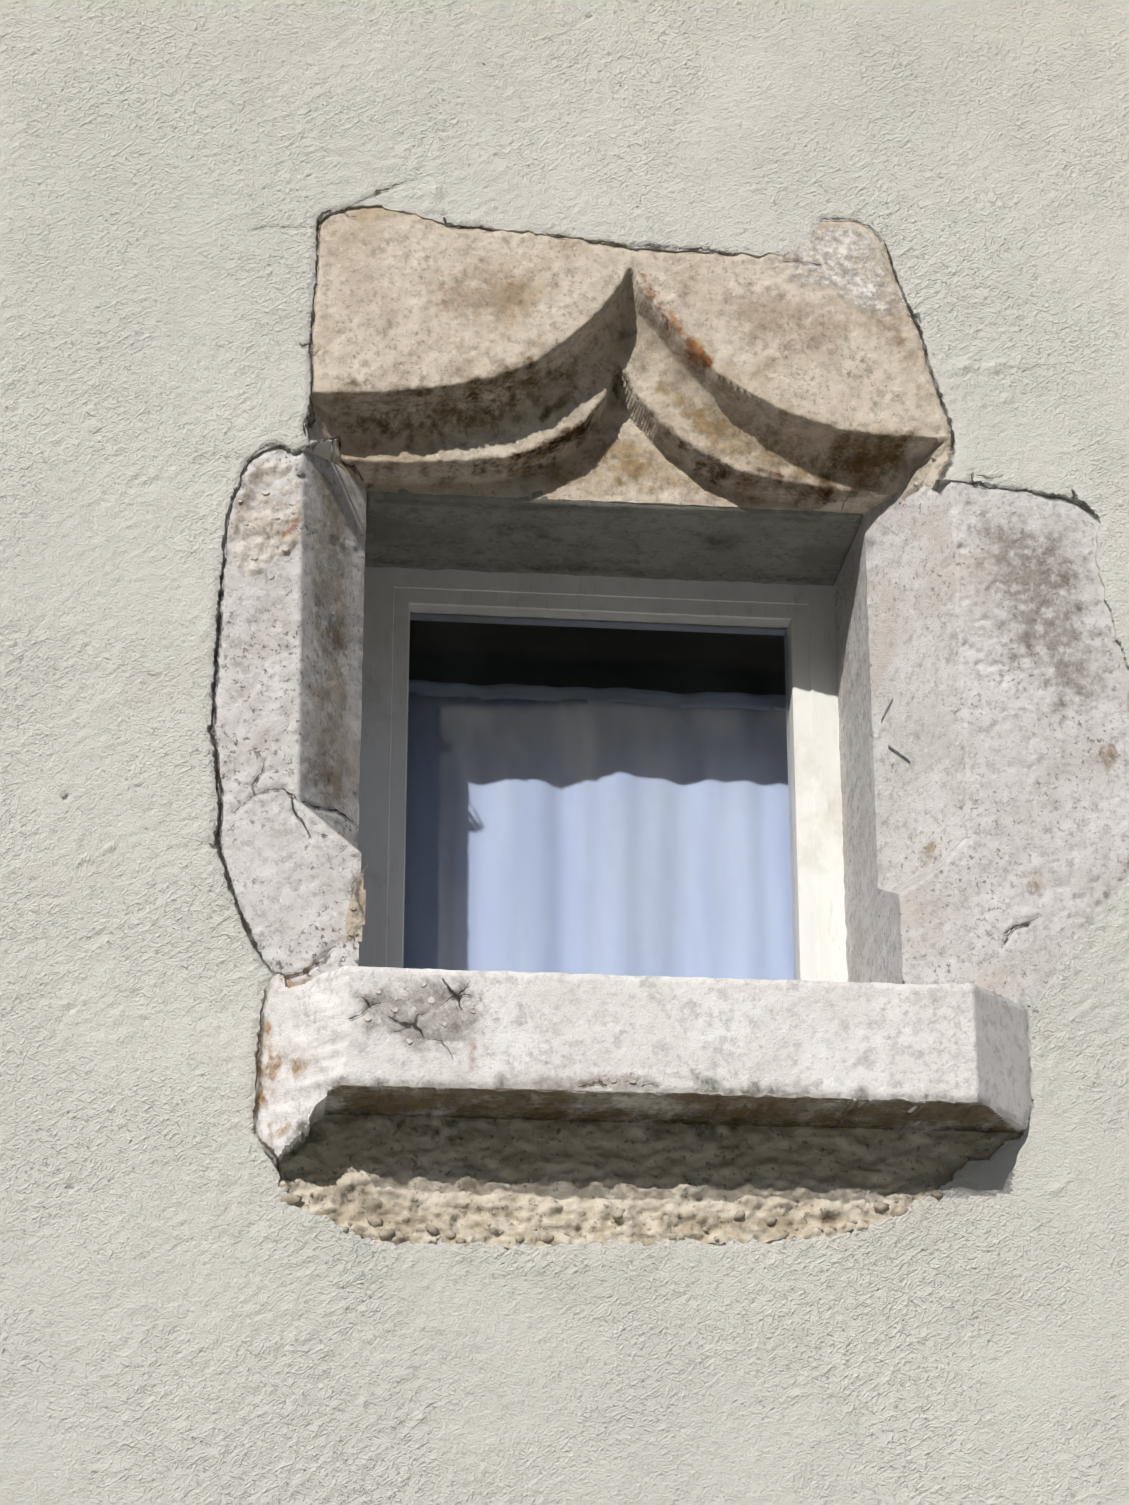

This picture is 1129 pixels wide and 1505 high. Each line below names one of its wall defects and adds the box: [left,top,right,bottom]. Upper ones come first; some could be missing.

crack [443,217,492,231]
crack [546,233,735,255]
water stain [351,360,576,442]
rust [648,289,712,368]
crack [820,217,1100,518]
water stain [739,432,902,487]
crack [207,179,417,1178]
crack [349,978,474,1060]
flaking render [276,1112,1022,1250]